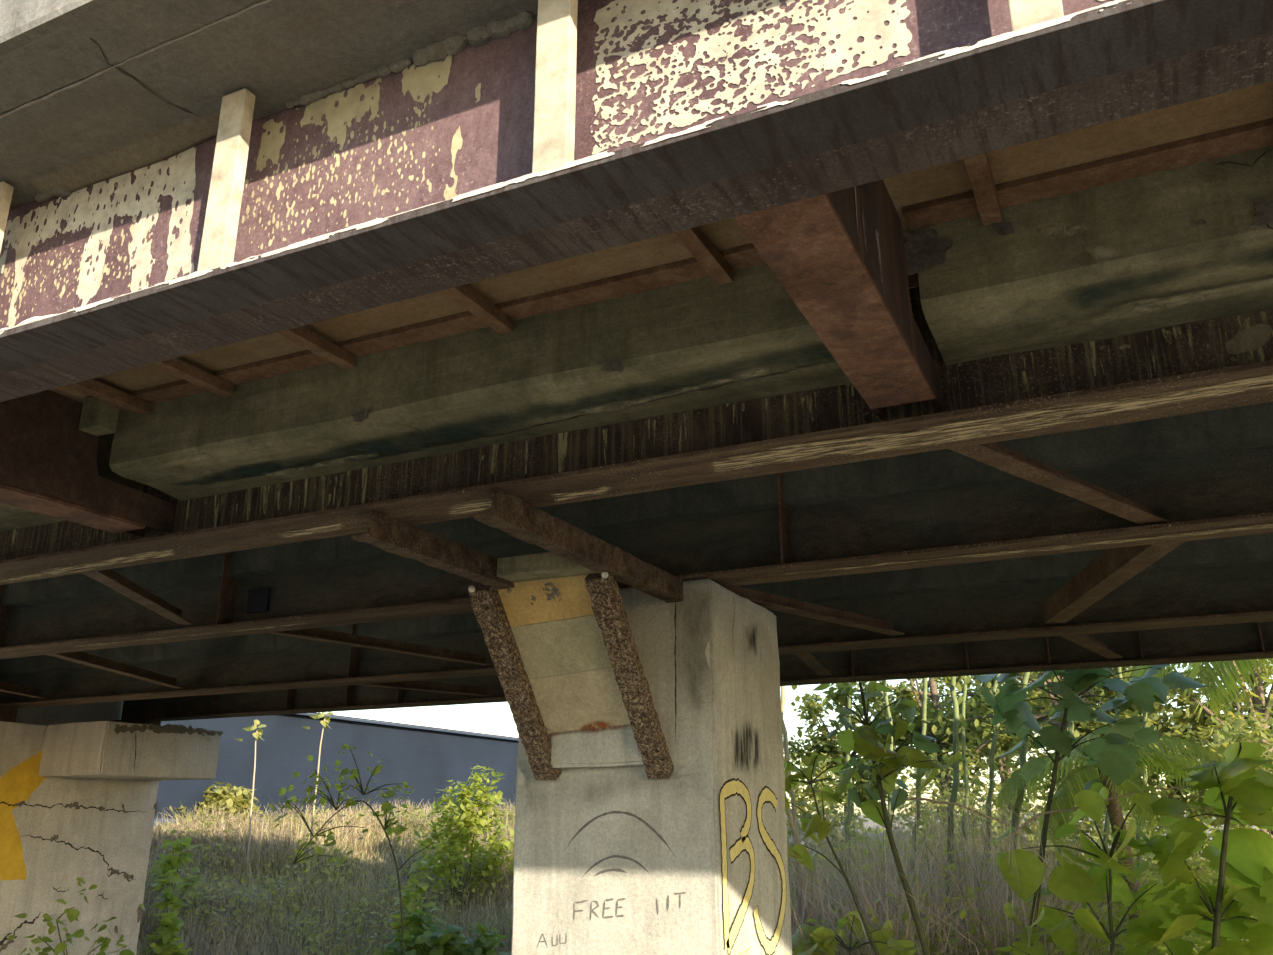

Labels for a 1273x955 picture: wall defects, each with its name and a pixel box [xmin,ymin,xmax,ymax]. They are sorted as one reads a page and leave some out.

crack [0,0,272,119]
peeling [254,77,381,172]
peeling [401,54,452,103]
peeling [444,0,1129,202]
peeling [0,147,388,334]
water stain [1075,275,1273,324]
water stain [529,346,834,421]
water stain [180,417,509,527]
water stain [557,432,568,473]
rust [581,722,620,731]
crack [0,801,159,952]